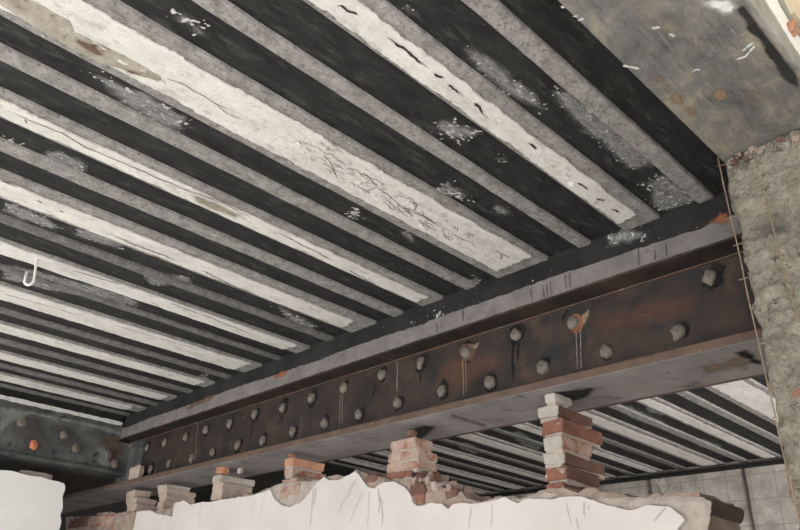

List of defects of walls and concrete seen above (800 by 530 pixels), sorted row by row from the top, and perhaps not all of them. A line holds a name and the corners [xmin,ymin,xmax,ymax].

leakage [77,41,102,55]
crack [395,43,458,93]
leakage [120,87,192,132]
crack [168,79,240,119]
crack [14,113,247,216]
crack [293,142,475,247]
corrosion [562,310,589,369]